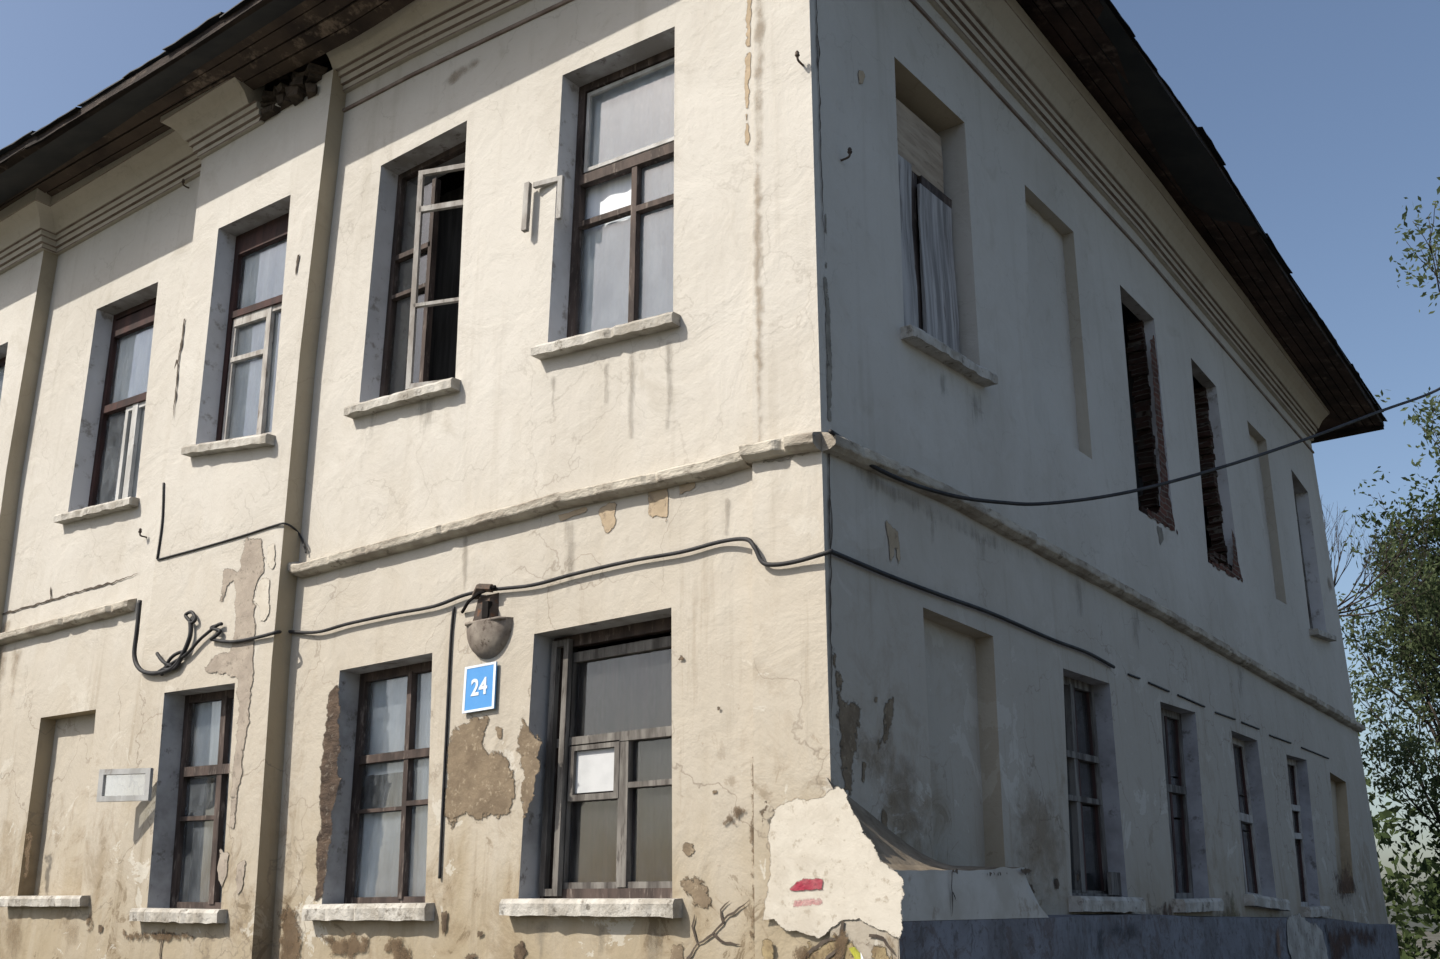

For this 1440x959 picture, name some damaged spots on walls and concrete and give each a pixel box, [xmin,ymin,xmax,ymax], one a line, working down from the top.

peeling [205,536,275,829]
flaking render [314,685,342,901]
flaking render [444,715,543,829]
peeling [761,646,905,959]
peeling [217,848,246,895]
flaking render [278,908,301,959]
flaking render [321,932,411,959]
crack [686,900,749,959]
spalling [1287,913,1328,959]